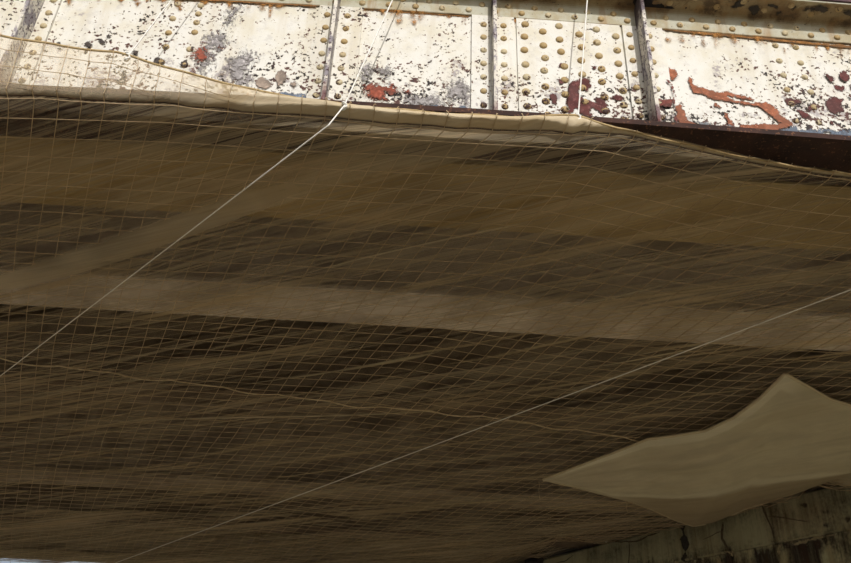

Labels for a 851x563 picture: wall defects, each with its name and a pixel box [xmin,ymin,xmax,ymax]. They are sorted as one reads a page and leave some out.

peeling [180,2,307,98]
peeling [356,60,471,108]
peeling [658,68,712,125]
peeling [688,70,851,136]
water stain [754,532,851,563]